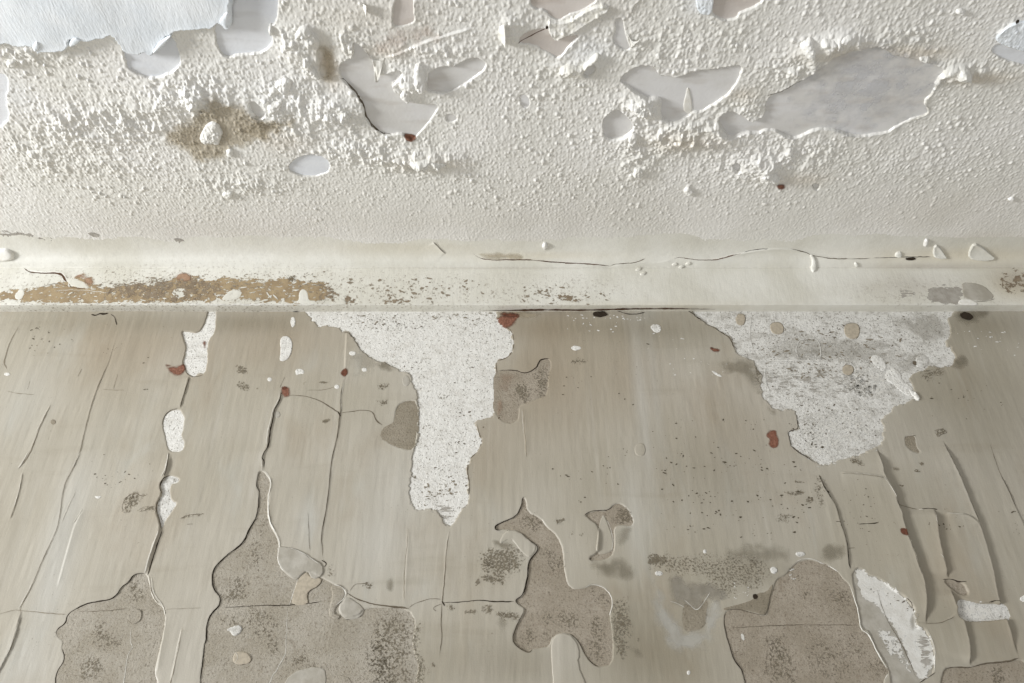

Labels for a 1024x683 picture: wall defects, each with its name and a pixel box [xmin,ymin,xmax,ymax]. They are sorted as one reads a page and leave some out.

peeling [0,0,278,76]
crack [0,313,117,668]
spalling [0,268,551,528]
crack [261,377,382,567]
corrosion [497,313,519,328]
crack [475,255,646,276]
corrosion [767,430,778,448]
spalling [692,282,993,467]
crack [793,249,928,272]
crack [144,532,186,683]
peeling [200,470,418,683]
peeling [648,549,1024,683]